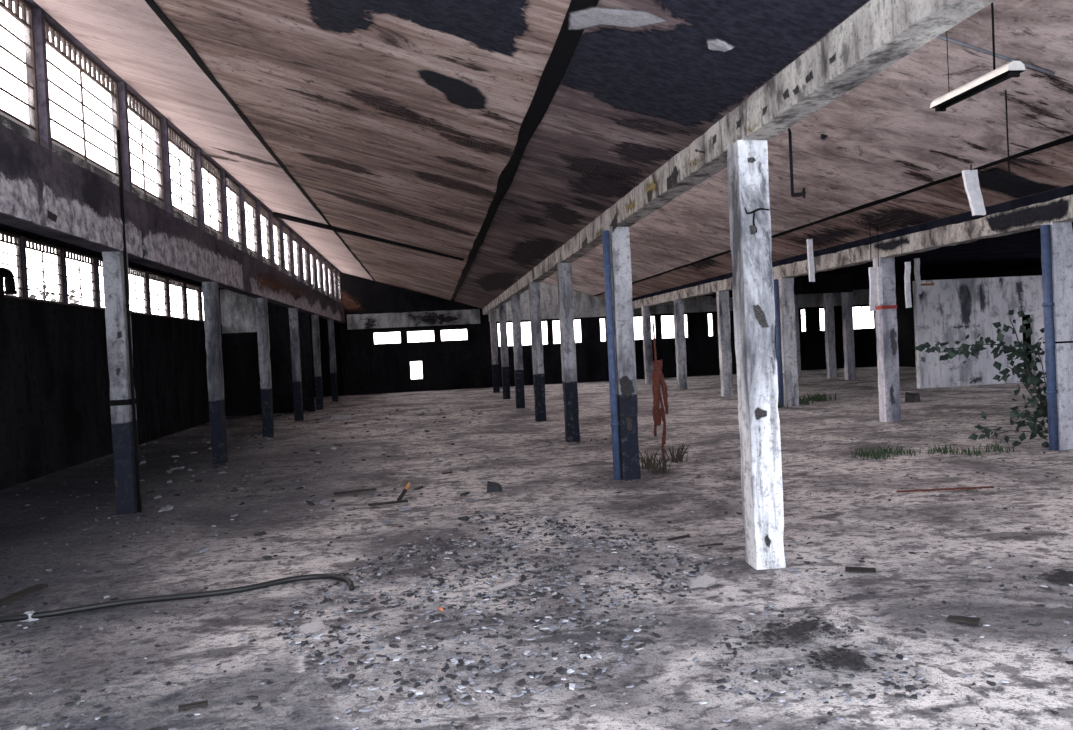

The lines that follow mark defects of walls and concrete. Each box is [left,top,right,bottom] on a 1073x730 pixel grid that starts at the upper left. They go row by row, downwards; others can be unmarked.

water stain [417,48,522,125]
water stain [271,82,531,173]
water stain [206,148,281,168]
water stain [298,152,382,178]
water stain [758,163,767,198]
water stain [317,189,478,237]
peeling [0,172,363,321]